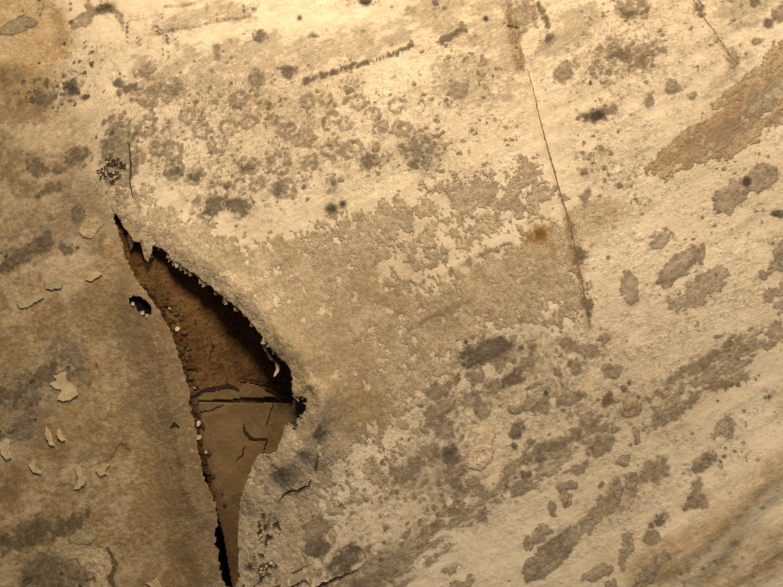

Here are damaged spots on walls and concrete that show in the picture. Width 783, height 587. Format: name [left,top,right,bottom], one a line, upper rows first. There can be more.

leakage [112,43,498,227]
crack [506,0,590,327]
peeling [644,39,783,182]
crack [693,0,737,63]
leakage [0,0,222,587]
peeling [111,152,593,587]
leakage [300,318,783,587]
peeling [618,532,634,572]
peeling [633,549,672,587]